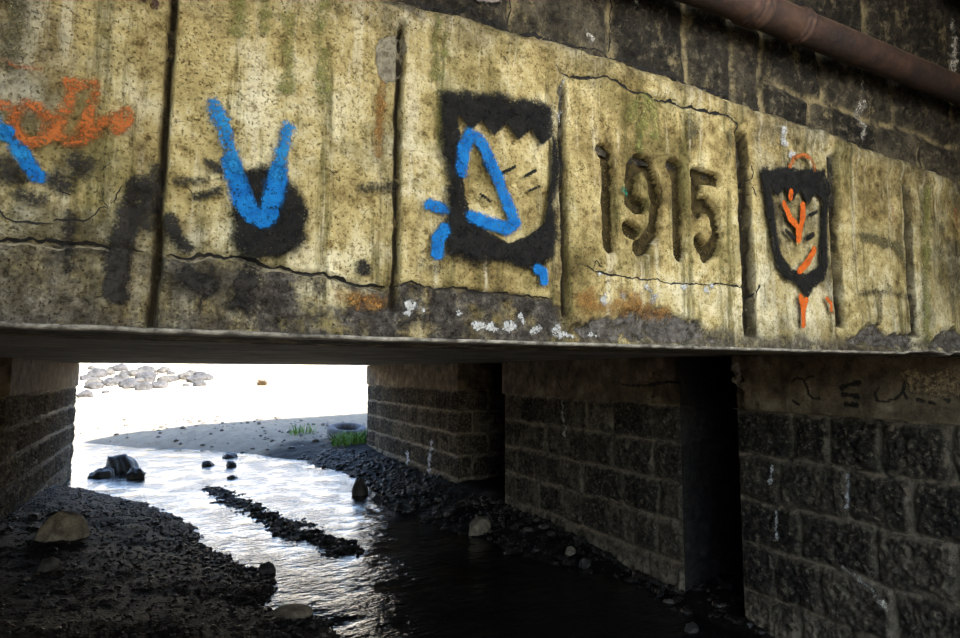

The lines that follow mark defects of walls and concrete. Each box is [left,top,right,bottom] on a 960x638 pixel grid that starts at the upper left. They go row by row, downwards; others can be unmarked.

damp [258,0,298,94]
damp [312,0,331,104]
spalling [376,35,407,84]
crack [415,0,738,134]
crack [738,163,757,197]
crack [0,164,122,251]
crack [132,249,553,316]
rust [335,291,387,311]
damp [402,299,425,317]
damp [471,312,573,339]
rust [576,287,670,321]